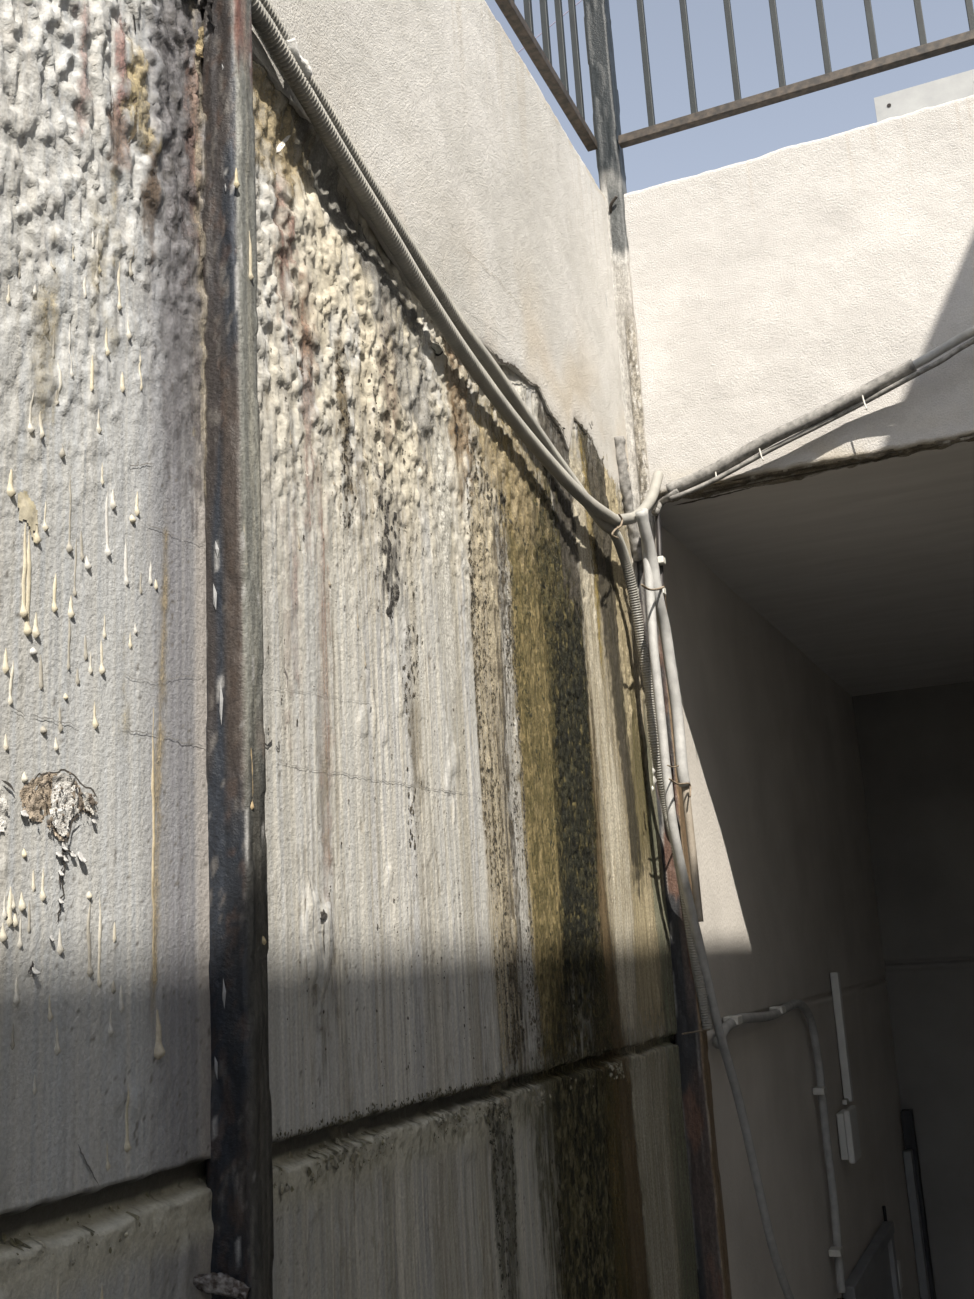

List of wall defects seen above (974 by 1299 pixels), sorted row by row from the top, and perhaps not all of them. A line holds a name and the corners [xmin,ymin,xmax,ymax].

rust [73,6,90,133]
rust [109,19,130,168]
peeling [488,346,593,446]
leakage [252,63,699,1299]
spalling [0,769,98,864]
crack [50,835,72,942]